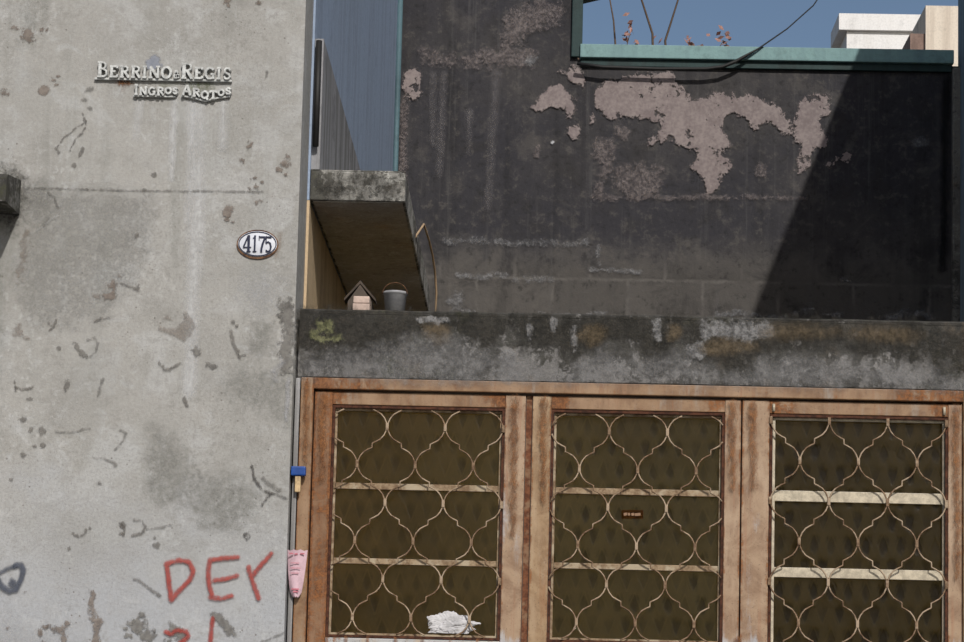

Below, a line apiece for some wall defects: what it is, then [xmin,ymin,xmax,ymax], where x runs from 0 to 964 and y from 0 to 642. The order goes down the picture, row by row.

peeling [400,68,423,178]
peeling [531,64,831,196]
damp [295,293,964,380]